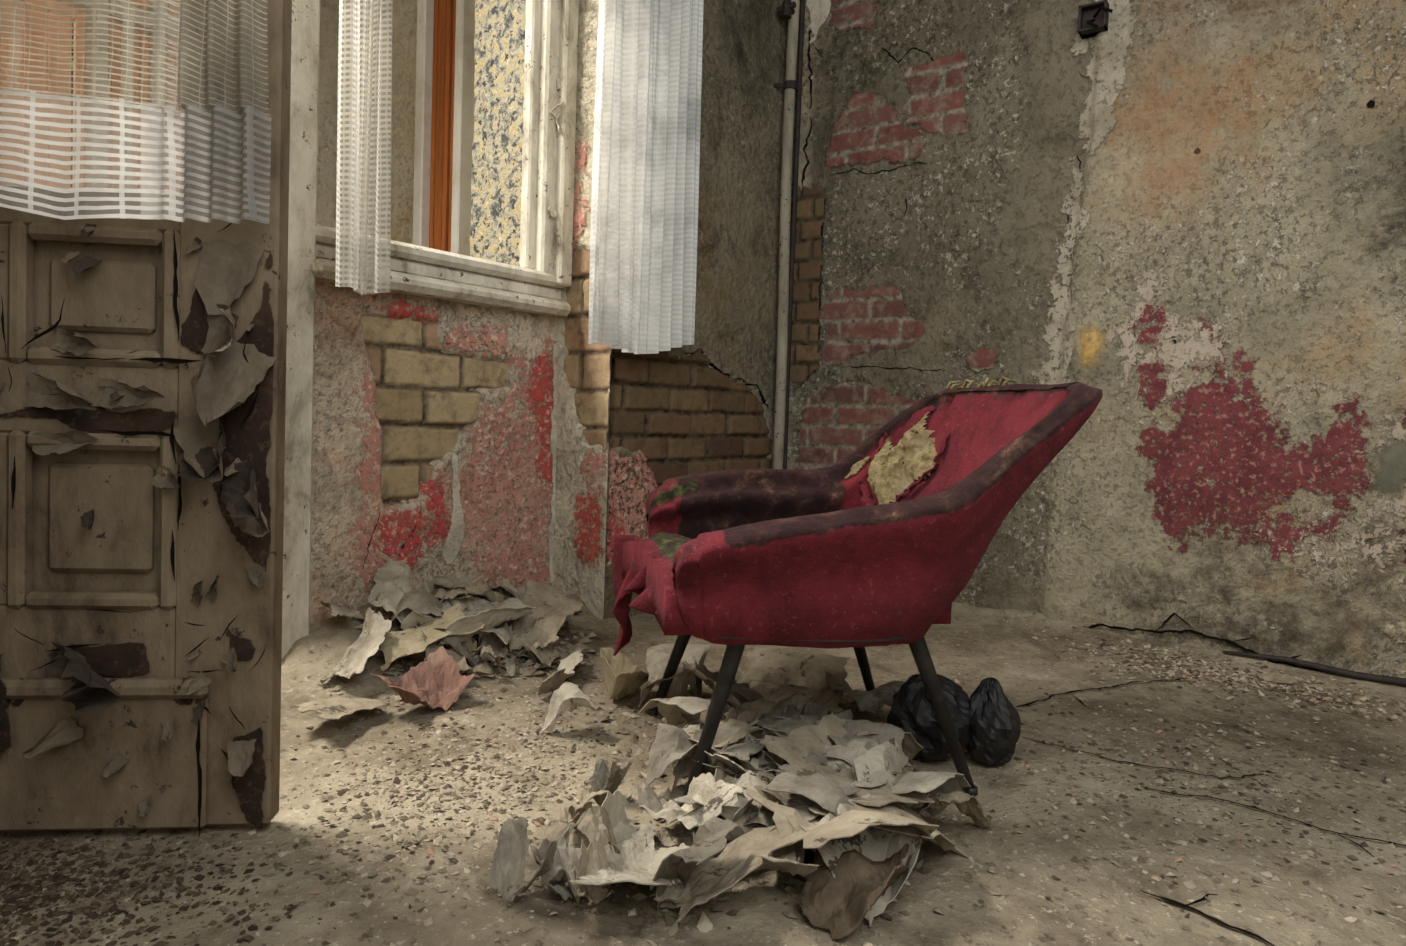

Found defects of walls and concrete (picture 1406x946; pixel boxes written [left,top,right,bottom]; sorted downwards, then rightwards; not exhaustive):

peeling [0,628,150,758]
peeling [0,217,277,588]
peeling [190,574,220,607]
peeling [161,615,267,837]
spalling [336,79,772,605]
flaking render [825,51,970,172]
spalling [1031,0,1137,385]
peeling [1099,239,1406,614]